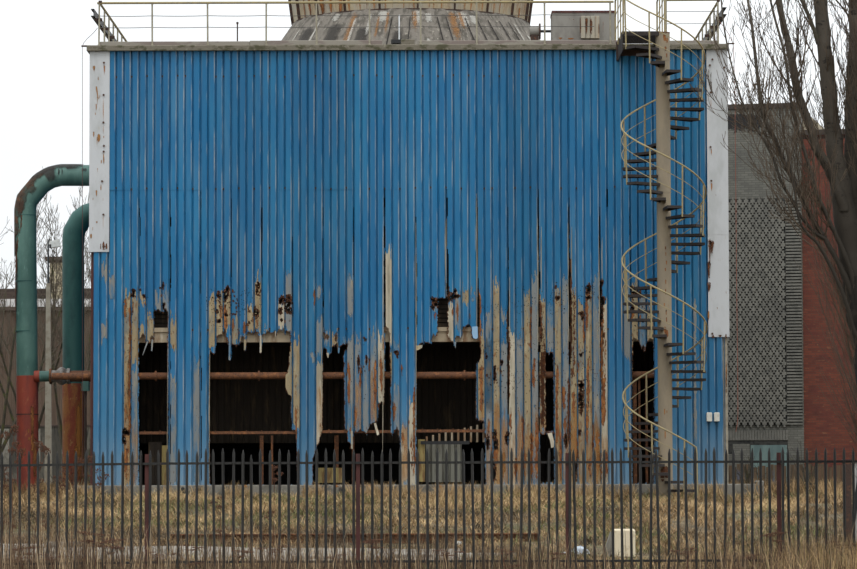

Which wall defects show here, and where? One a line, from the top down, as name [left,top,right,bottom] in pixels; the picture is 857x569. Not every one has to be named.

corrosion [303,0,389,40]
corrosion [124,288,154,483]
peeling [193,269,268,484]
peeling [278,243,416,485]
peeling [434,282,476,343]
corrosion [419,259,608,482]